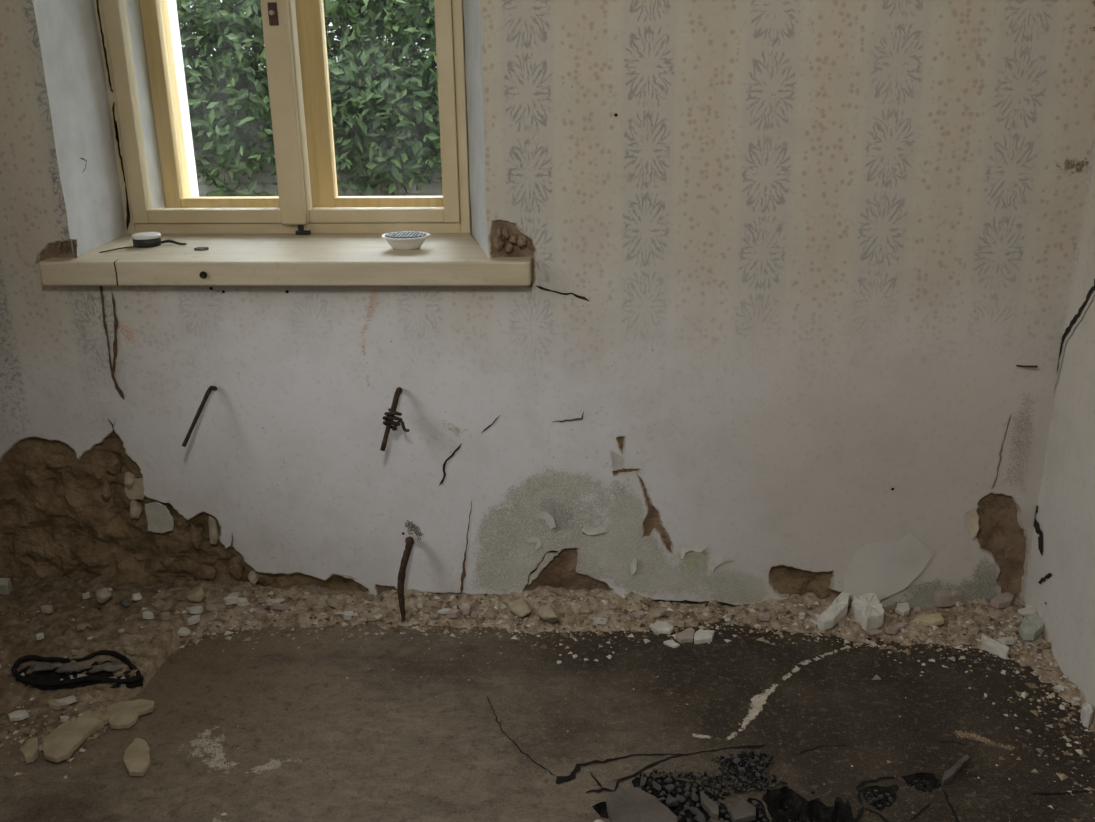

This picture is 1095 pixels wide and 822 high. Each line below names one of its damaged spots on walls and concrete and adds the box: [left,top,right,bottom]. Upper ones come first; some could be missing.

flaking render [488,219,537,288]
crack [1053,279,1095,395]
flaking render [0,430,407,596]
peeling [437,436,933,604]
flaking render [966,492,1029,600]
crack [487,697,766,793]
crack [855,776,960,822]